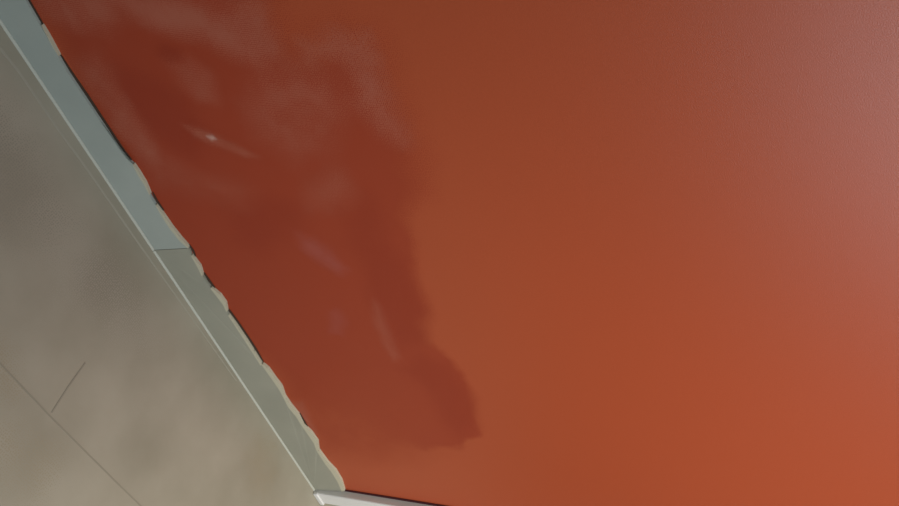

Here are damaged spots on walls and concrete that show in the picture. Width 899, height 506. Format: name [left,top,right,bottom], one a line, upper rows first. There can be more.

water stain [31,0,487,470]